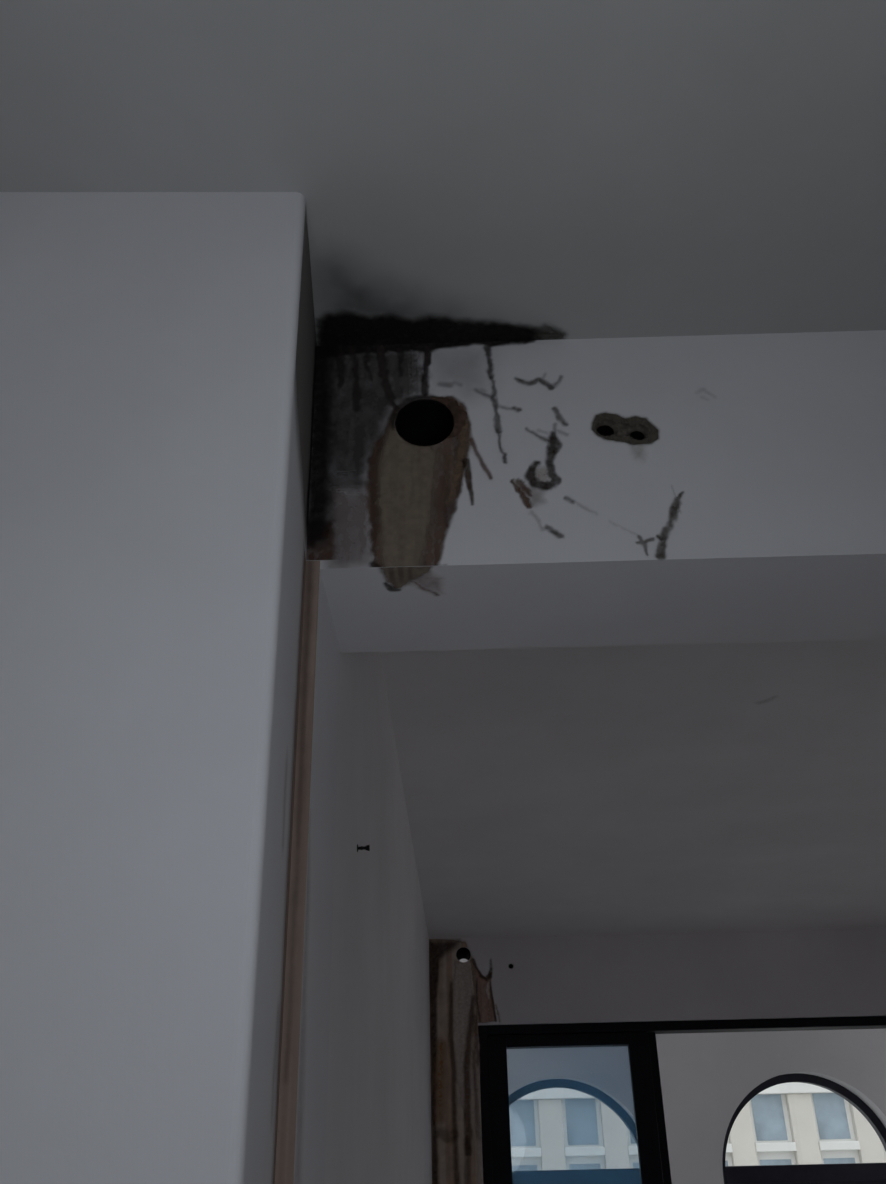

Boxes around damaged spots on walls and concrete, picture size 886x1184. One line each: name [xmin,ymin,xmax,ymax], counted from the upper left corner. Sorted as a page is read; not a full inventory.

hole [592,413,659,445]
crack [637,492,683,559]
leakage [273,209,565,1184]
peeling [471,959,497,1023]